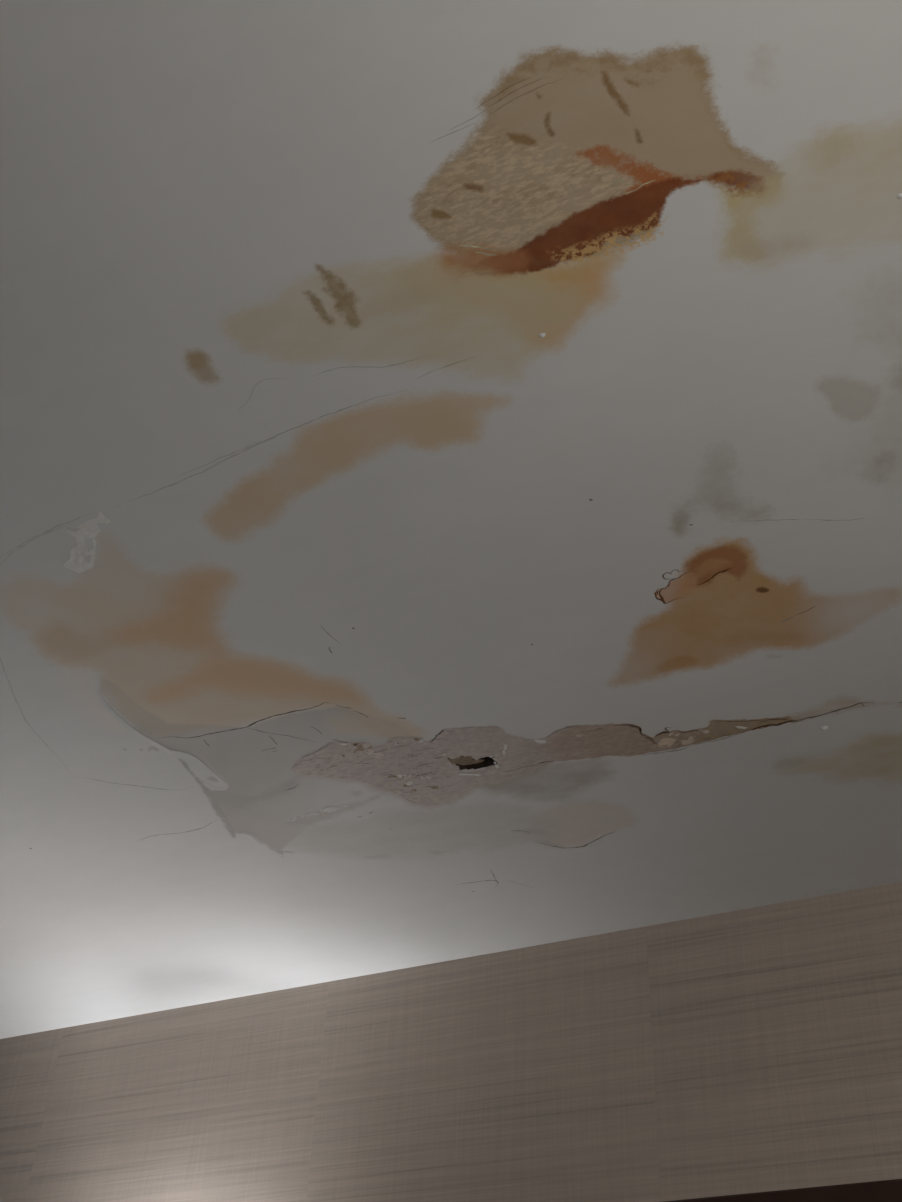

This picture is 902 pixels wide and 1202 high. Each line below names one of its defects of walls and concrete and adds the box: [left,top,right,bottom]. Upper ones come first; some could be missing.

leakage [0,25,902,746]
crack [163,702,368,752]
spalling [93,673,804,840]